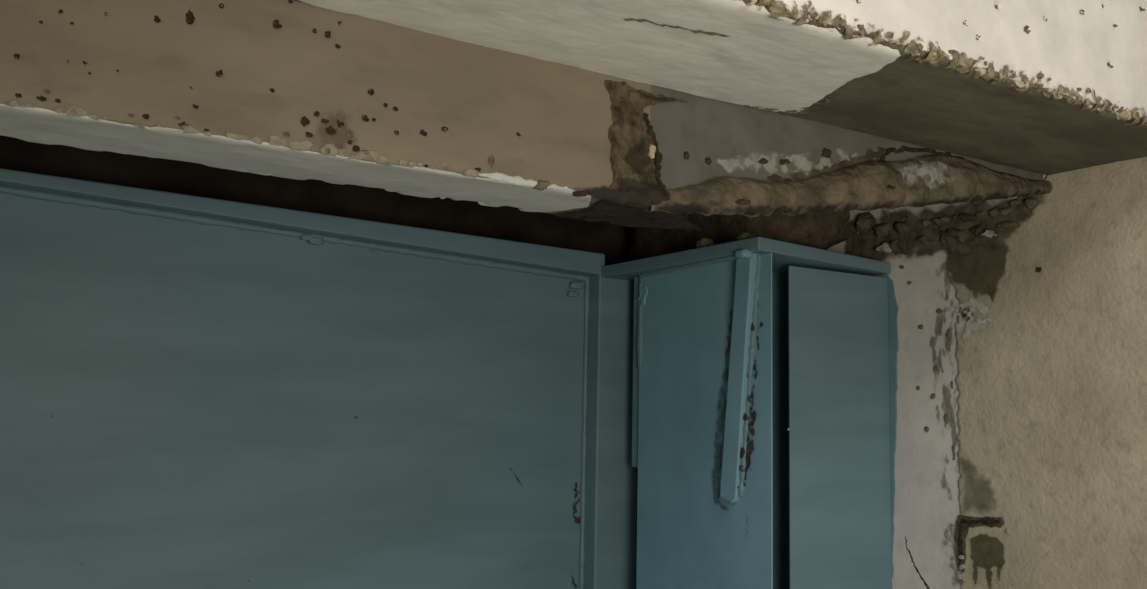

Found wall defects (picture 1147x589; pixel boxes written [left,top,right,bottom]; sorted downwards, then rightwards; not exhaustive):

spalling [743,0,1147,127]
peeling [916,262,993,499]
crack [905,537,930,589]
water stain [970,534,1005,589]